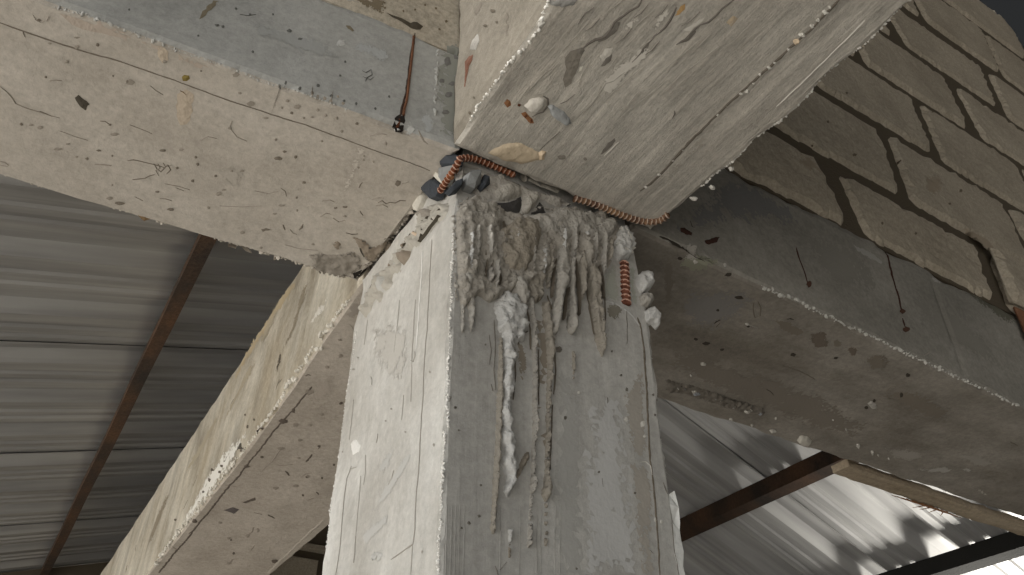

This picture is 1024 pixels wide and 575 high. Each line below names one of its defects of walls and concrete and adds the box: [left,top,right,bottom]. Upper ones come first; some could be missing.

water stain [184,279,308,475]
spalling [153,142,670,573]
water stain [183,432,246,523]